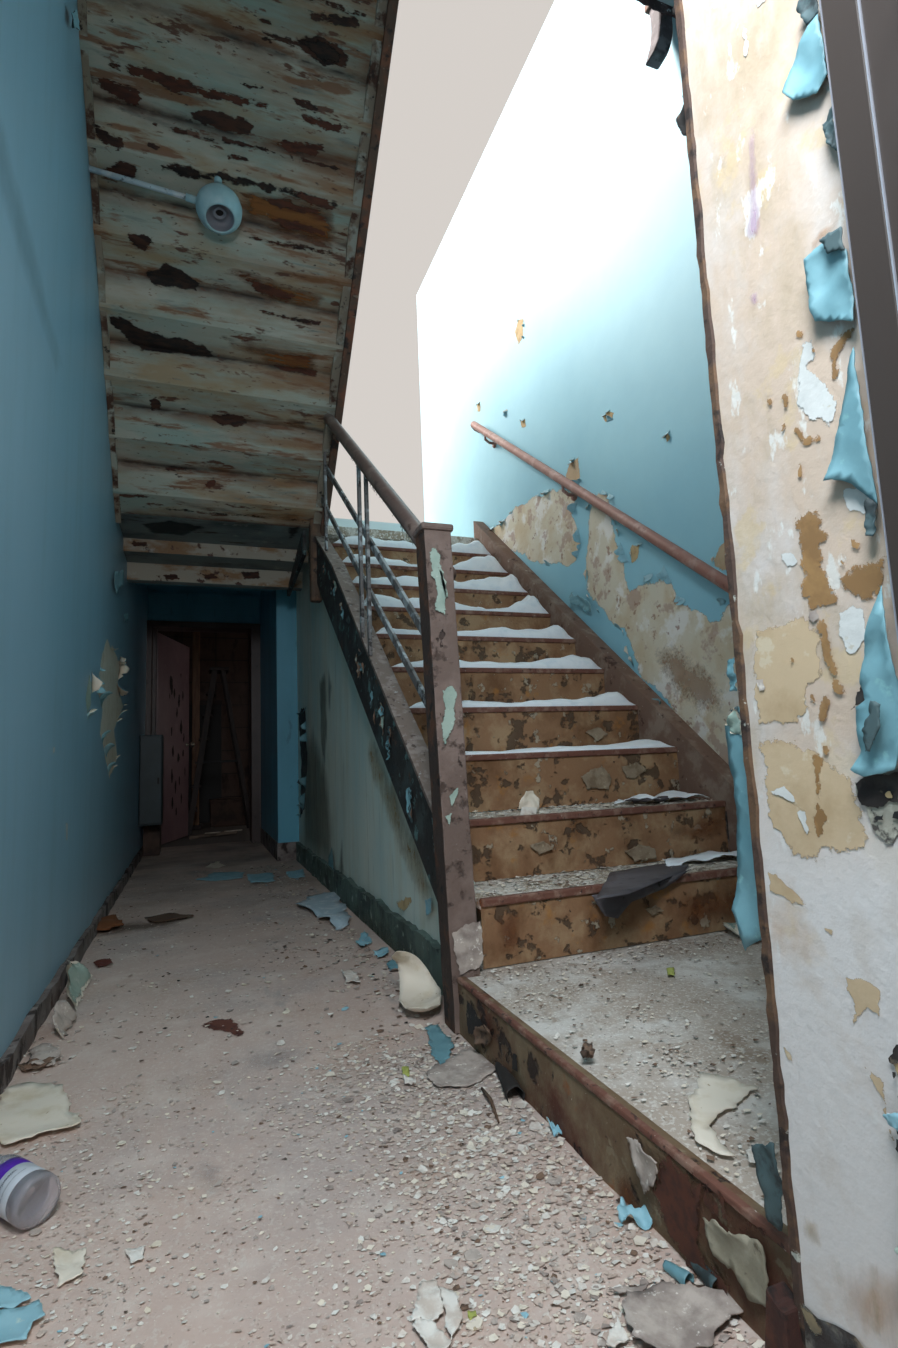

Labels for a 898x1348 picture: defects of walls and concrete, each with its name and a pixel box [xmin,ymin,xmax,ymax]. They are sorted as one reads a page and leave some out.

peeling [782,0,828,100]
peeling [822,107,837,151]
peeling [804,226,854,322]
peeling [823,347,878,536]
peeling [86,640,130,778]
peeling [490,458,898,951]
peeling [846,978,880,1023]
spalling [865,1045,898,1152]
corrosion [620,1186,633,1205]
corrosion [653,1150,767,1296]
peeling [702,1217,769,1307]
spalling [801,1304,863,1348]